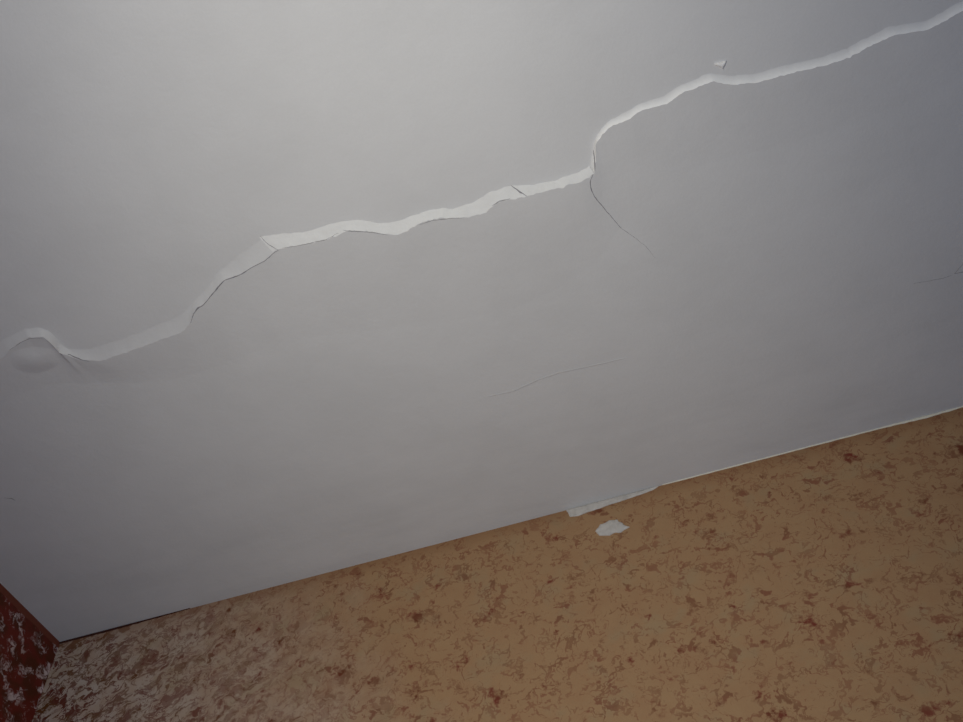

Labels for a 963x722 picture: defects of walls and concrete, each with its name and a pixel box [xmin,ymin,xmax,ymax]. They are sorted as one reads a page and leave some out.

crack [0,1,963,404]